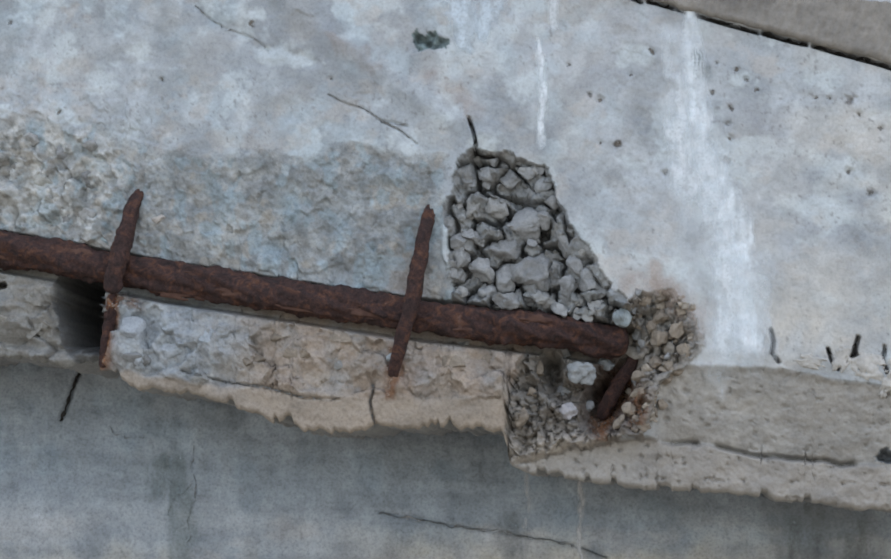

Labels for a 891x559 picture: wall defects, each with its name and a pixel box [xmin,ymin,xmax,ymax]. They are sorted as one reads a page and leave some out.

crack [59,373,81,421]
spalling [0,110,707,466]
crack [380,511,606,558]
water stain [665,11,763,357]